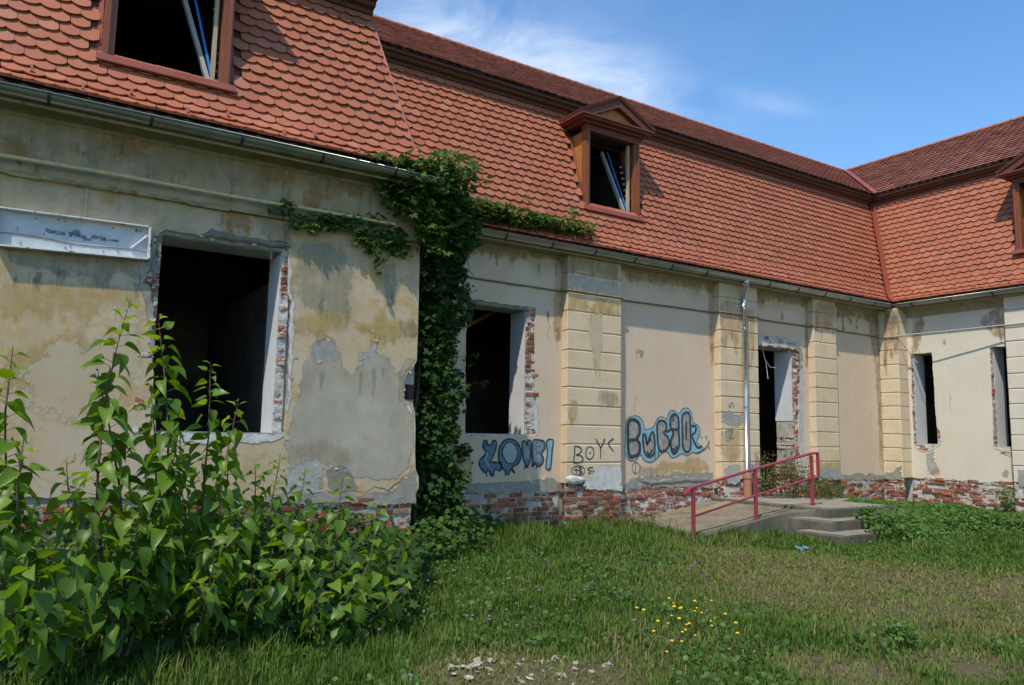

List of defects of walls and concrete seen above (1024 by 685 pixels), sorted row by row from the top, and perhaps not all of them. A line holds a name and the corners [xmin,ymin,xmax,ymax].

peeling [19,229,417,505]
flaking render [465,299,540,436]
spalling [456,445,755,494]
flaking render [758,335,805,488]
peeling [911,347,1024,488]